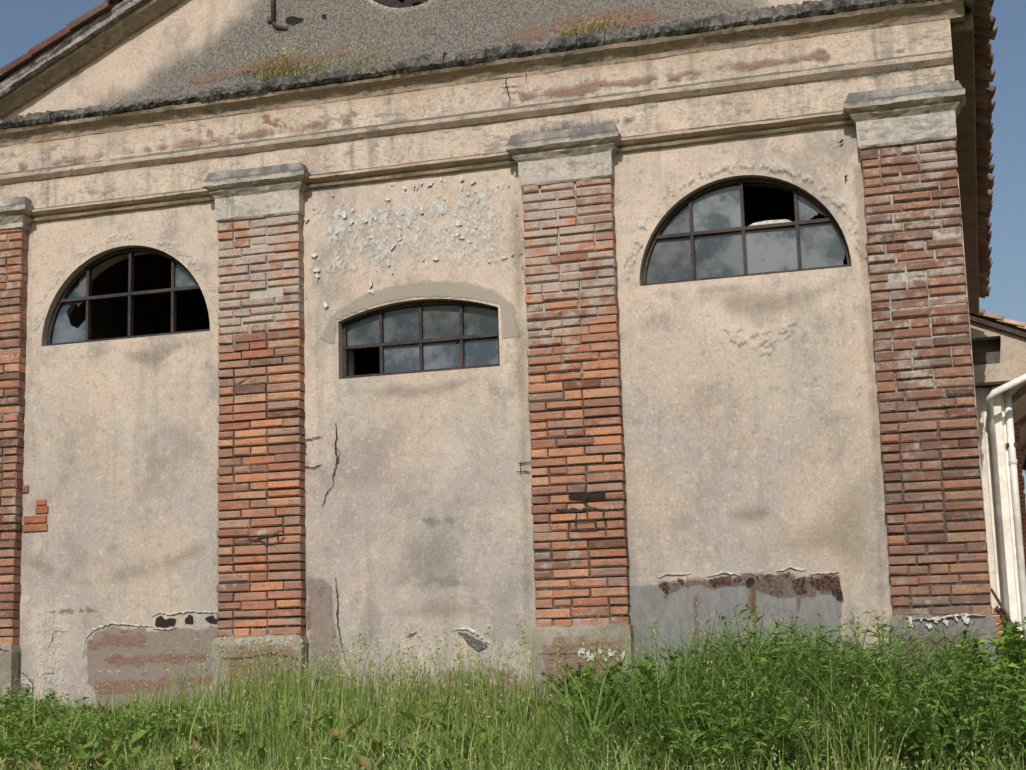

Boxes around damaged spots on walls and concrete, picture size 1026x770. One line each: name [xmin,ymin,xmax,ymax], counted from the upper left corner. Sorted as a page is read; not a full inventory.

flaking render [658,566,843,601]